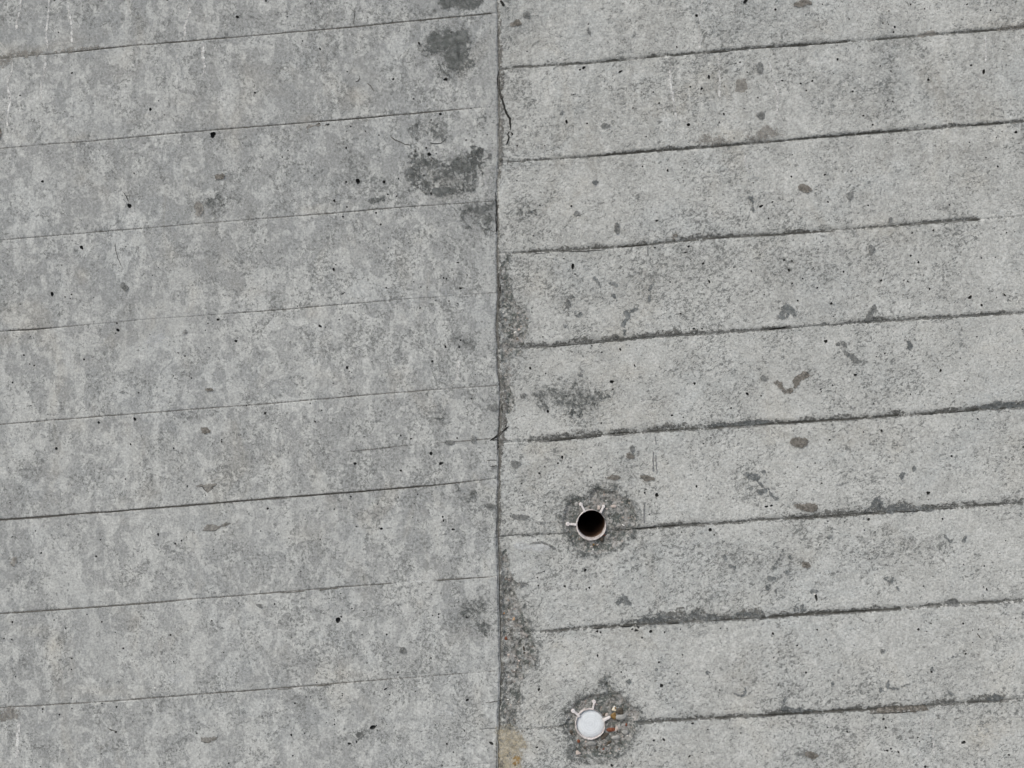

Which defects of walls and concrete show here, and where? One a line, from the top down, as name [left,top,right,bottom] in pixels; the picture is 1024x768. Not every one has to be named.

damp [419,28,475,79]
crack [497,71,512,145]
damp [406,146,483,197]